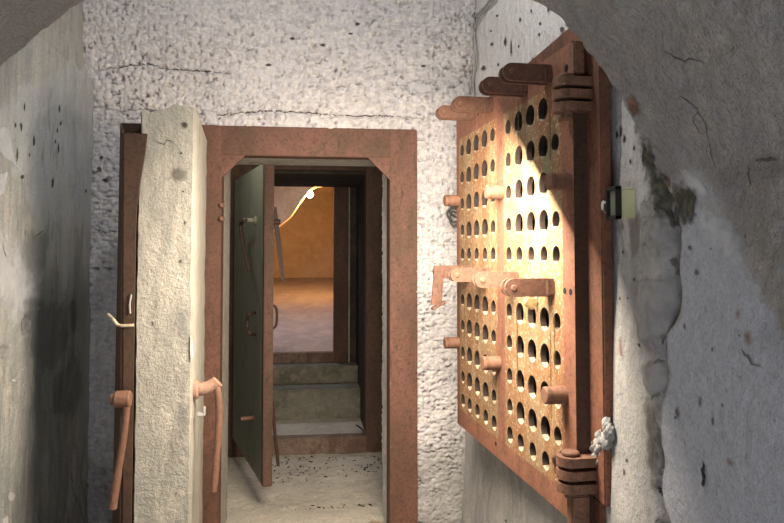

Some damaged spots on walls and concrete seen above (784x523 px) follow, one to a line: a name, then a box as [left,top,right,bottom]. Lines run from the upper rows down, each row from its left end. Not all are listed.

crack [101,63,220,73]
peeling [0,123,22,165]
water stain [641,142,696,226]
spalling [641,200,691,276]
peeling [0,232,39,335]
spalling [645,405,665,495]